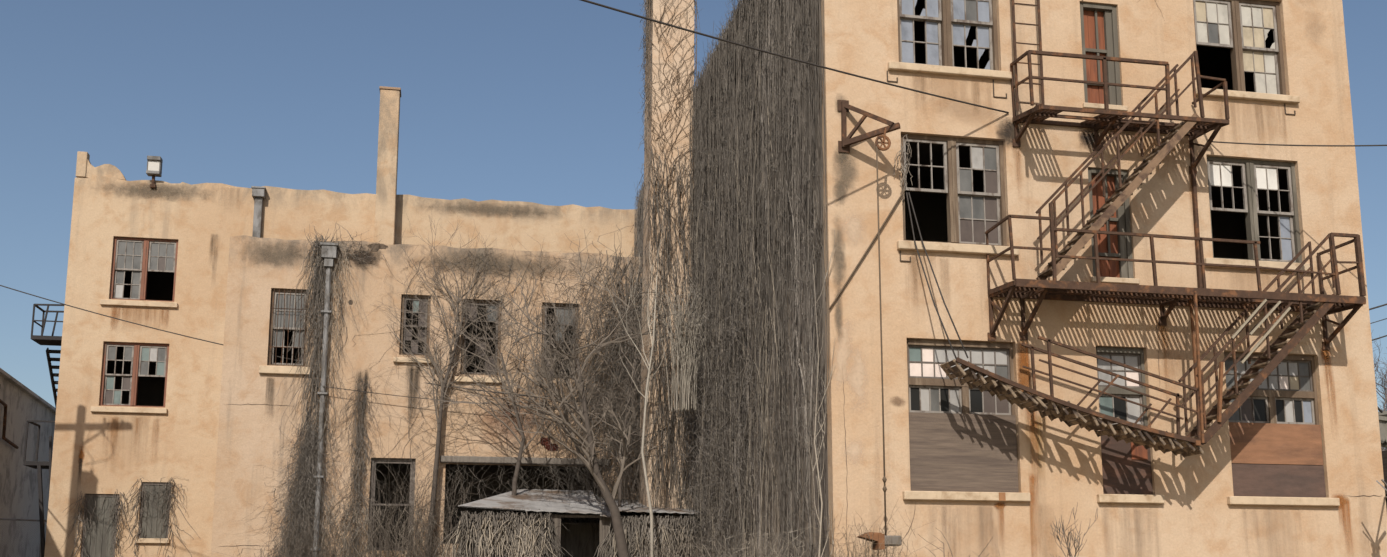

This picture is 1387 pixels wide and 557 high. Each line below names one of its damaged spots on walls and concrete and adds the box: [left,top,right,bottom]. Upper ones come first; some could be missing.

leakage [129,185,182,196]
leakage [261,248,301,264]
leakage [349,251,377,266]
corrosion [995,493,1006,516]
corrosion [1334,496,1351,531]